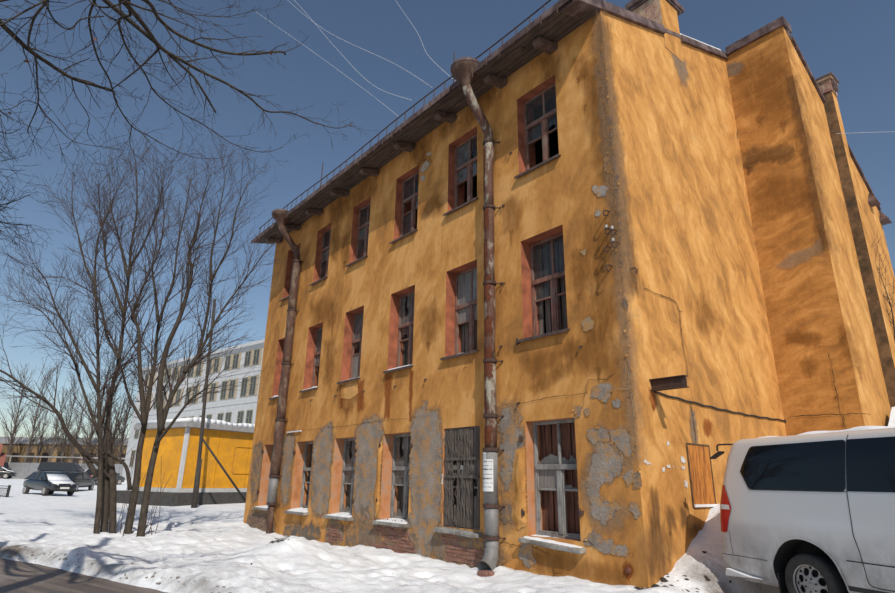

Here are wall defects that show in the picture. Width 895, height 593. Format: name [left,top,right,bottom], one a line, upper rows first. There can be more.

water stain [727,57,831,267]
rust [484,207,492,303]
peeling [572,14,652,558]
crack [792,354,870,429]
peeling [245,400,507,577]
peeling [497,403,526,529]
peeling [518,543,536,569]